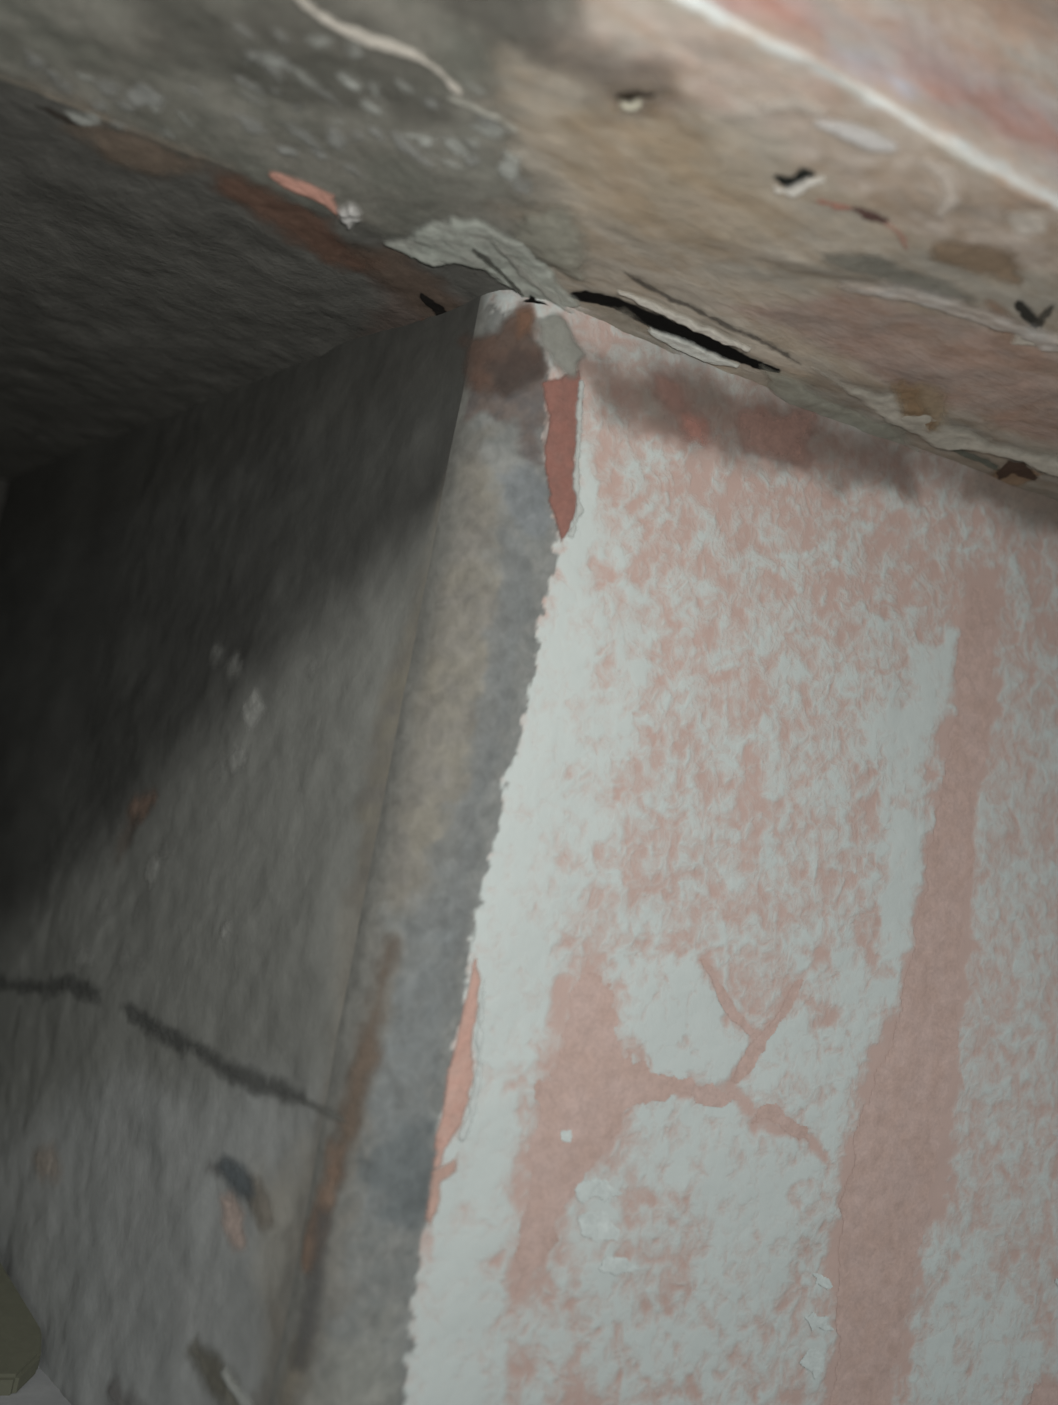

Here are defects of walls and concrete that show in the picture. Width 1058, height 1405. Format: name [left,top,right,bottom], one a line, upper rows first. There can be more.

leakage [0,0,575,240]
leakage [553,51,666,104]
spalling [774,168,824,198]
peeling [764,98,894,151]
crack [473,248,798,373]
spalling [1013,300,1054,346]
peeling [543,371,584,539]
crack [0,977,340,1119]
peeling [427,960,484,1224]
peeling [514,958,809,1296]